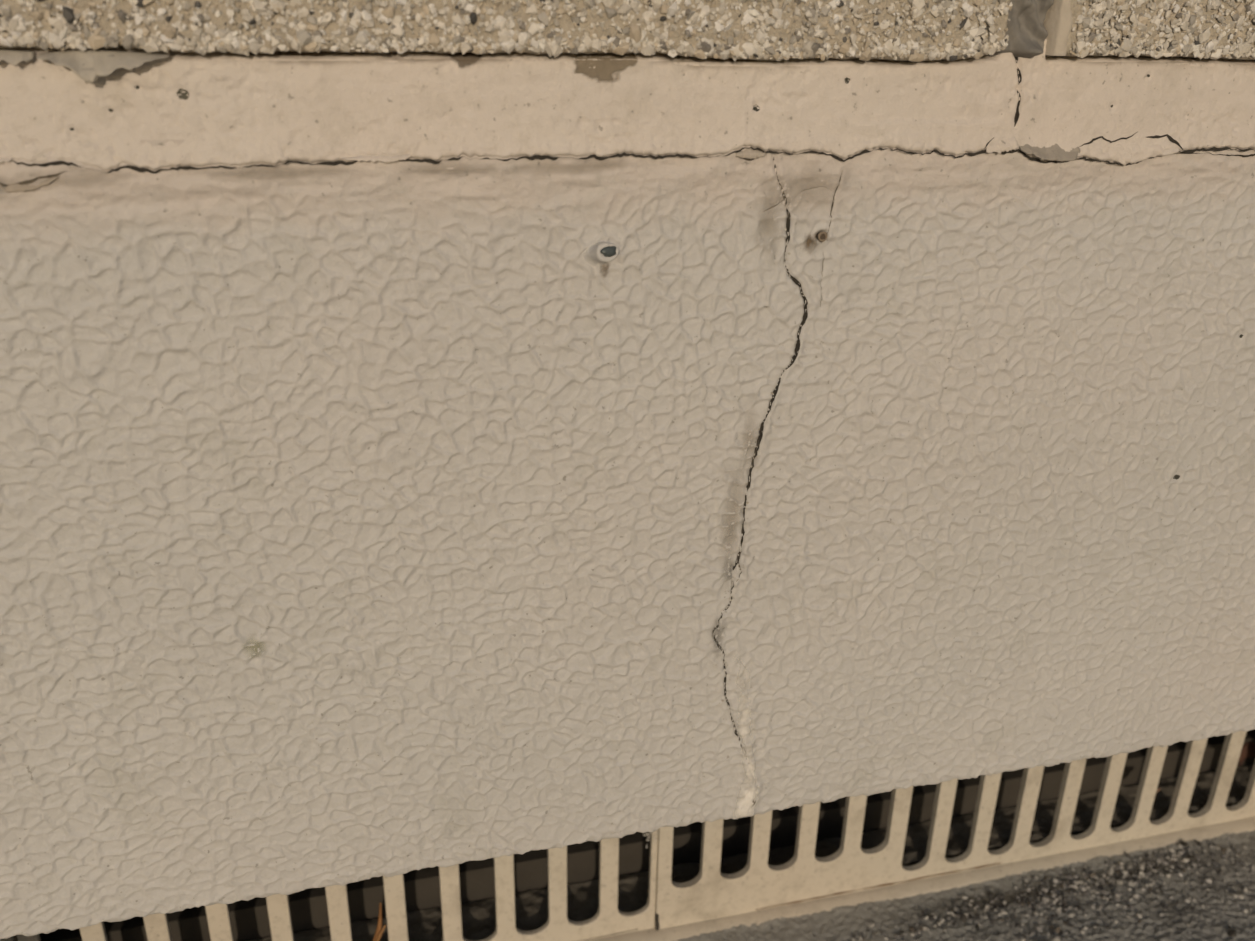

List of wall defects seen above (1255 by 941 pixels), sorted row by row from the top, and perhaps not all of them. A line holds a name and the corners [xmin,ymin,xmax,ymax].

peeling [986,136,1080,162]
crack [0,160,357,187]
crack [399,57,1255,805]